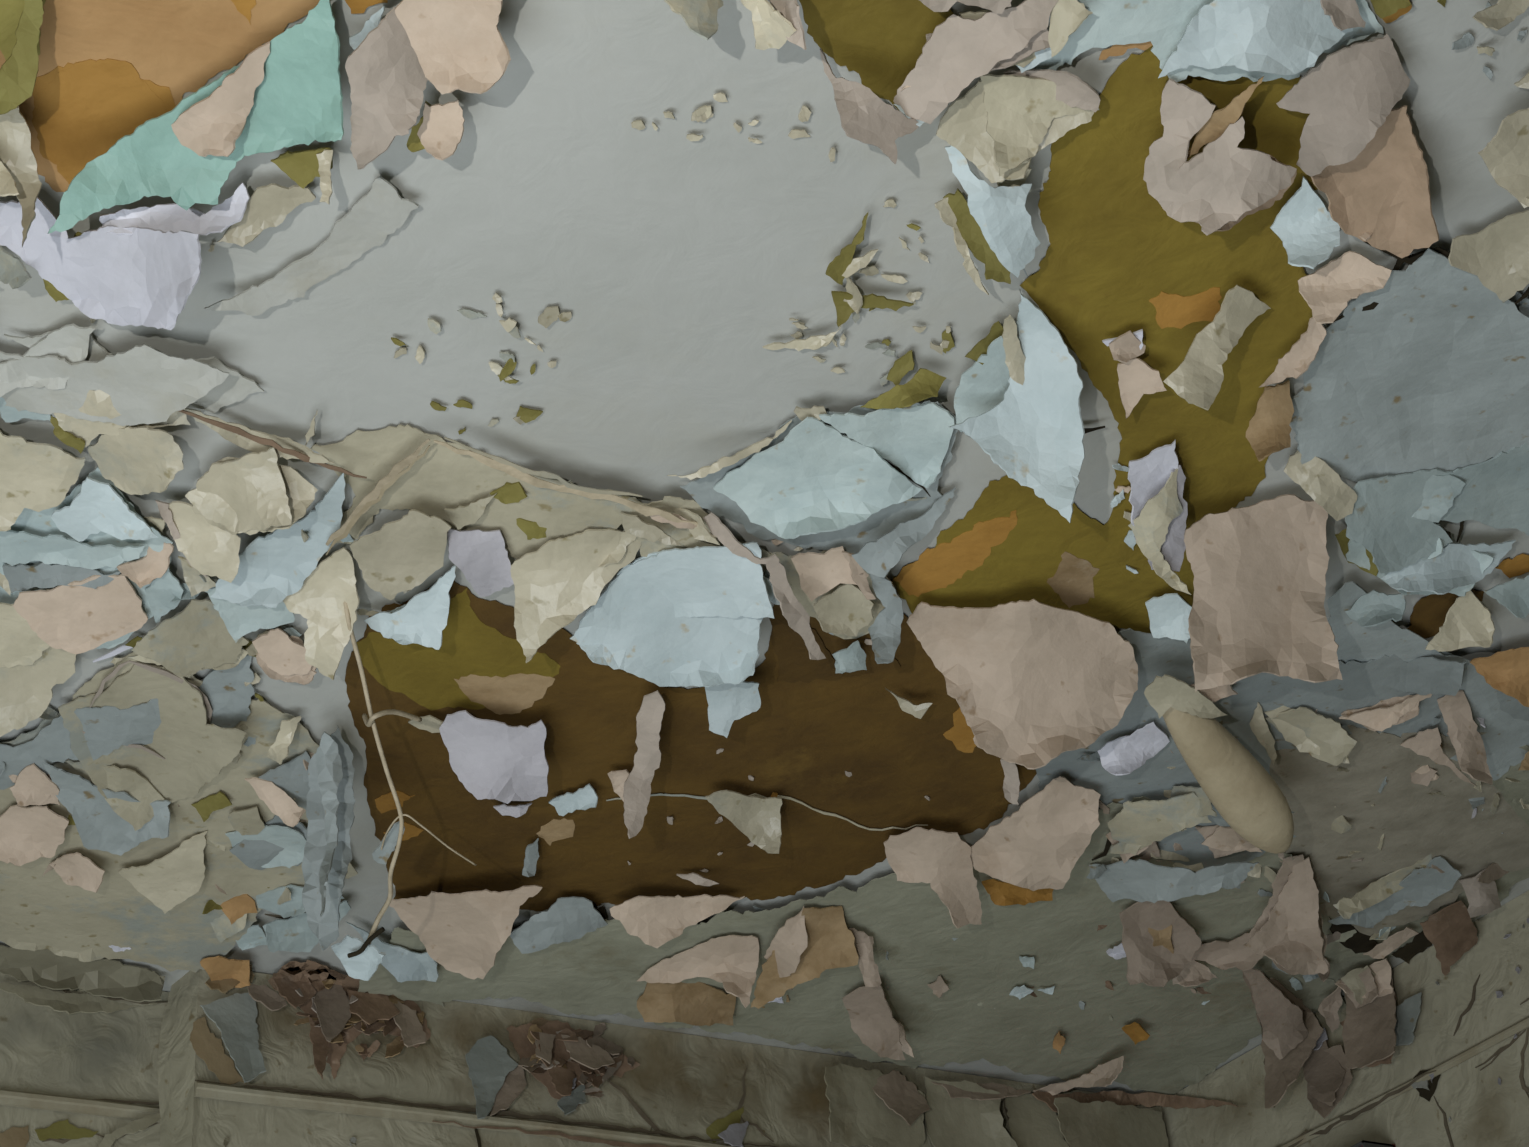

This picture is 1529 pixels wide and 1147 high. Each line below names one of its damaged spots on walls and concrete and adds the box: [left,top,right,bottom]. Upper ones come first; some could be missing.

peeling [345,0,511,170]
peeling [0,0,344,330]
peeling [204,176,419,316]
peeling [615,0,1529,1119]
peeling [0,324,1266,1095]
peeling [0,1119,98,1147]
flaking render [452,1017,641,1119]
peeling [706,1107,749,1147]
crack [1453,974,1480,1036]
crack [1475,998,1529,1098]